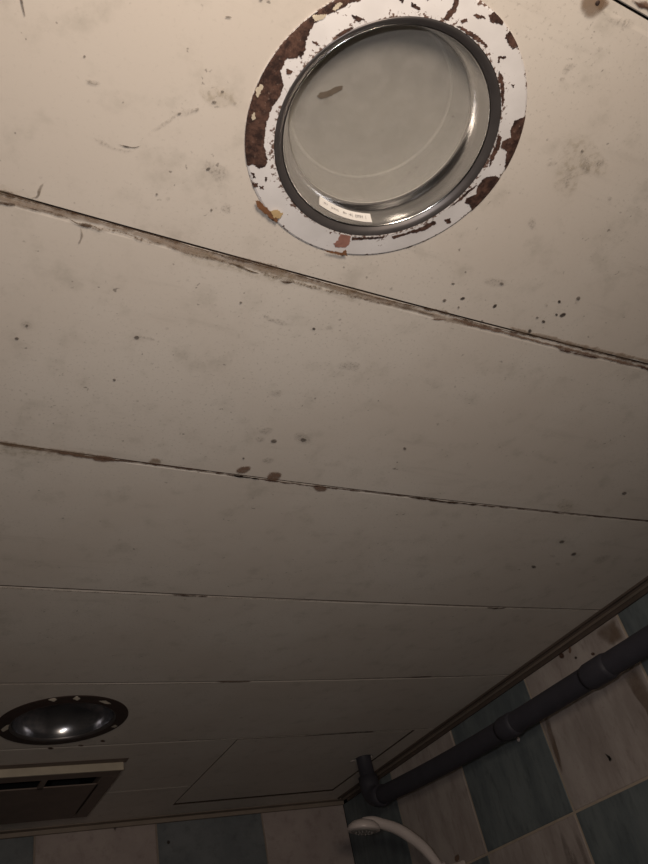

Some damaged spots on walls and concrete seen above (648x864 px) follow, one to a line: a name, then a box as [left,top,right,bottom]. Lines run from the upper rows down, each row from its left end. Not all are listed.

corrosion [245,0,365,189]
peeling [312,2,342,21]
corrosion [443,0,518,106]
corrosion [256,200,278,223]